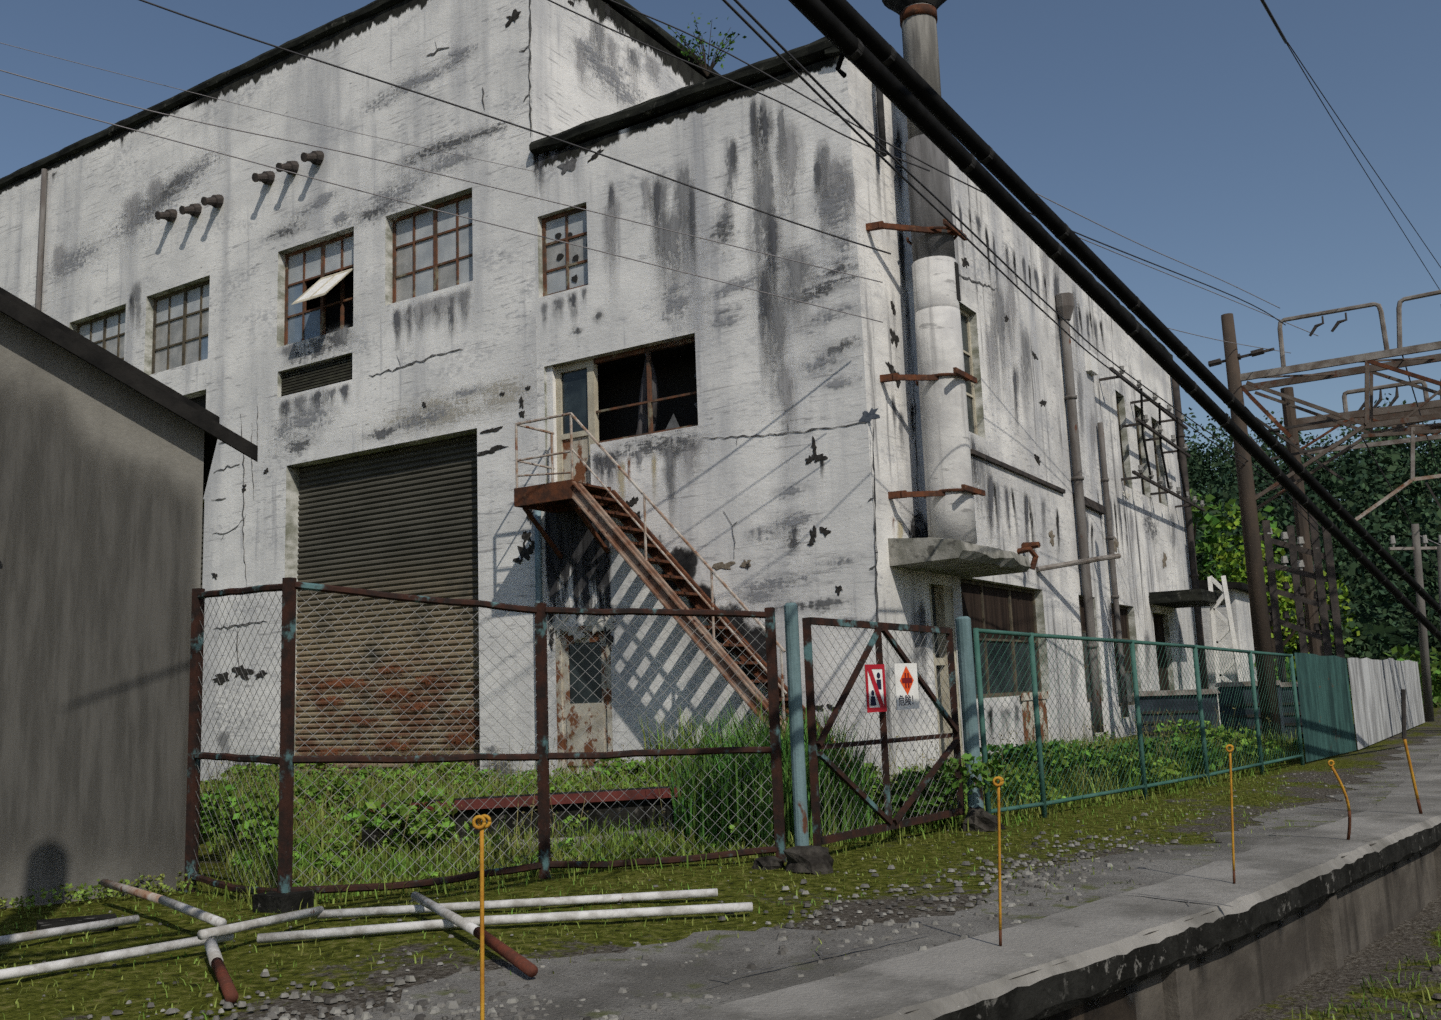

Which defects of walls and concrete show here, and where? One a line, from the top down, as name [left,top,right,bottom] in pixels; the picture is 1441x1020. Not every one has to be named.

damp [195,0,427,107]
damp [574,0,707,105]
damp [0,107,177,194]
damp [49,153,220,285]
damp [266,122,507,241]
damp [533,56,862,413]
damp [282,326,348,363]
damp [394,289,468,338]
crack [213,407,258,586]
damp [972,441,1060,551]
damp [1085,498,1175,545]
crack [214,621,267,667]